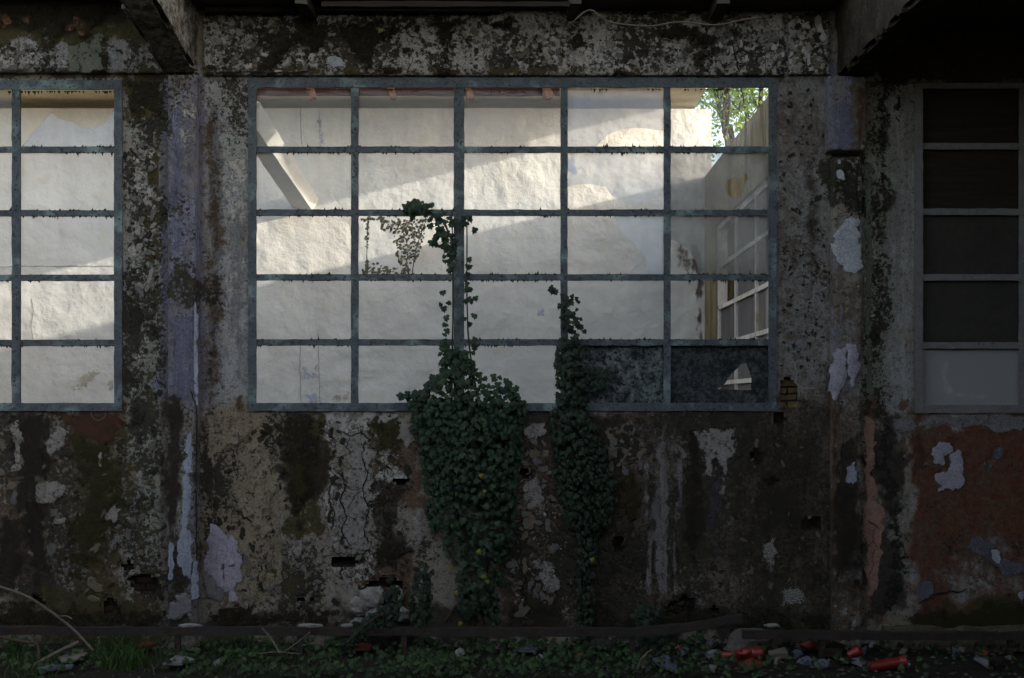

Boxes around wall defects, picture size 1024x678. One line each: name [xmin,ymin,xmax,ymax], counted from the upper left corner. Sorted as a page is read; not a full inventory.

peeling [831,216,864,273]
peeling [203,414,417,613]
crack [324,430,377,546]
peeling [506,422,560,618]
water stain [595,413,742,610]
peeling [694,428,737,495]
spalling [769,372,804,468]
peeling [828,344,861,400]
peeling [862,416,886,597]
peeling [891,413,1024,492]
peeling [966,535,1024,577]